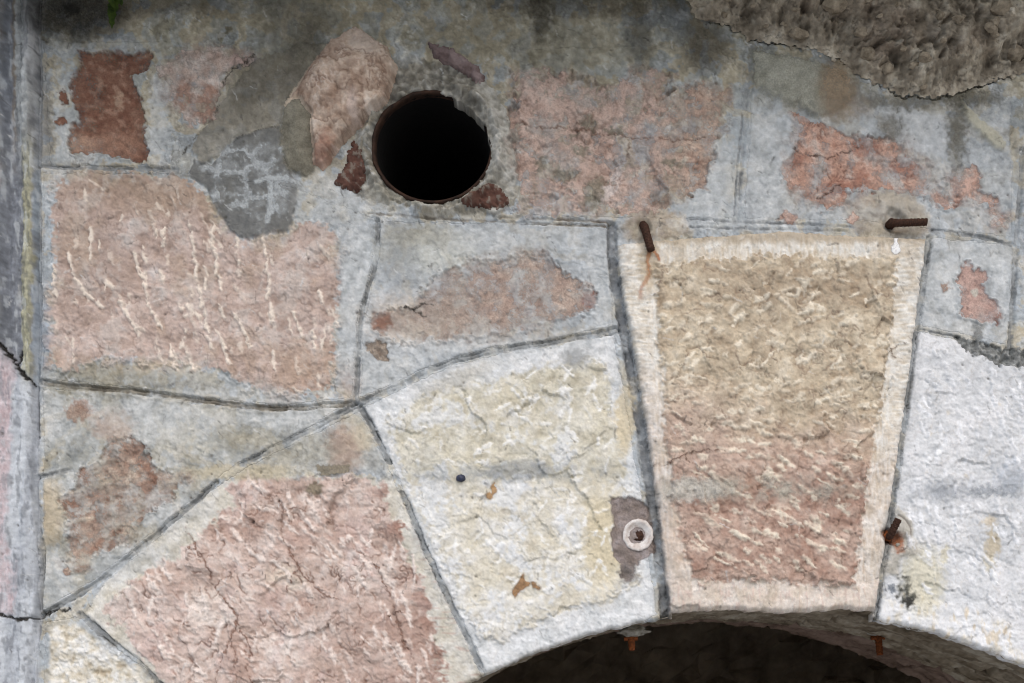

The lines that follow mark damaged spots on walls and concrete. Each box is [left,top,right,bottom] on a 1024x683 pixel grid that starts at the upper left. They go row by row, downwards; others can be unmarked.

crack [0,342,37,387]
crack [187,538,253,683]
crack [276,495,334,598]
crack [359,552,408,649]
corrosion [512,574,540,597]
corrosion [882,531,903,550]